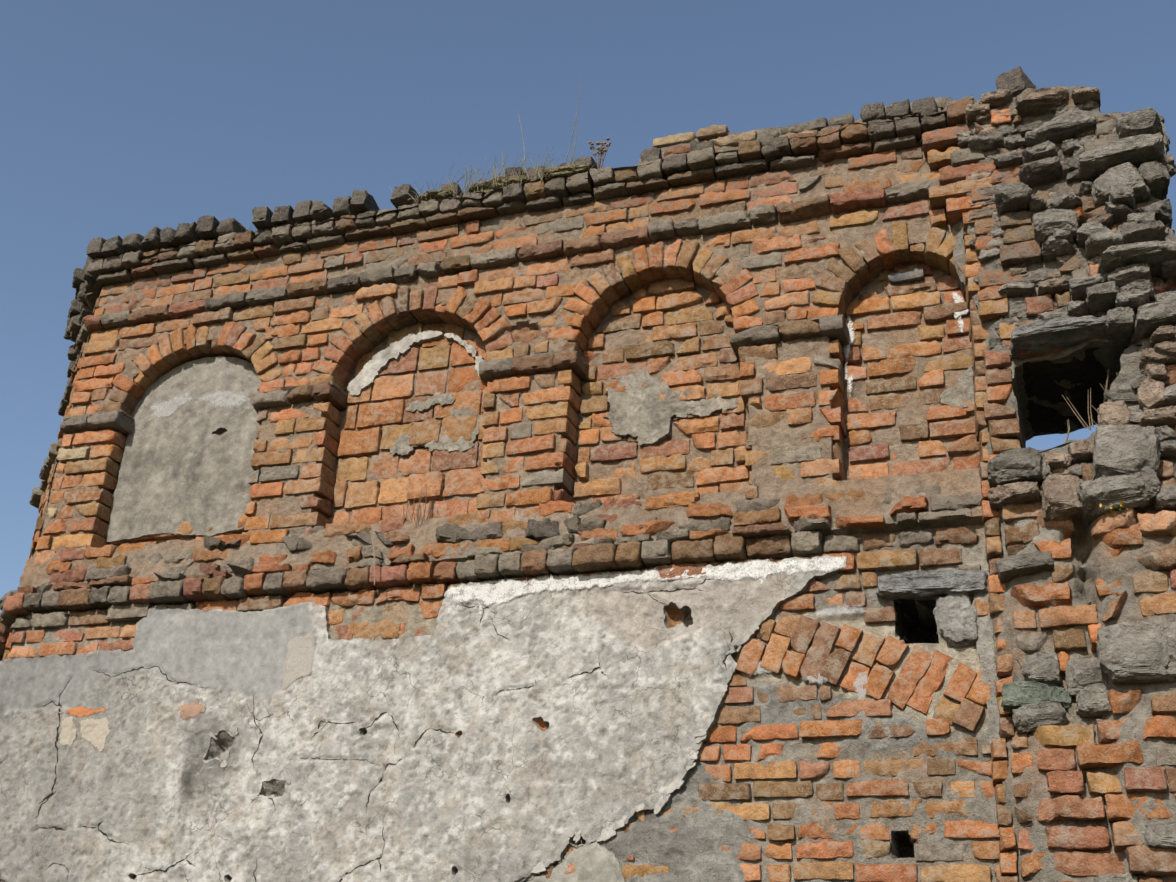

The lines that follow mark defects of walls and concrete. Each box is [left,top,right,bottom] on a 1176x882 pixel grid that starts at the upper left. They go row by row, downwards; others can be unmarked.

hole [658,602,701,634]
crack [569,658,609,679]
spalling [60,706,110,753]
crack [35,666,209,845]
hole [205,726,239,768]
crack [251,696,273,771]
spalling [533,717,549,731]
hole [250,778,291,800]
crack [290,712,453,882]
peeling [560,729,708,848]
crack [134,853,195,876]
crack [514,844,571,882]